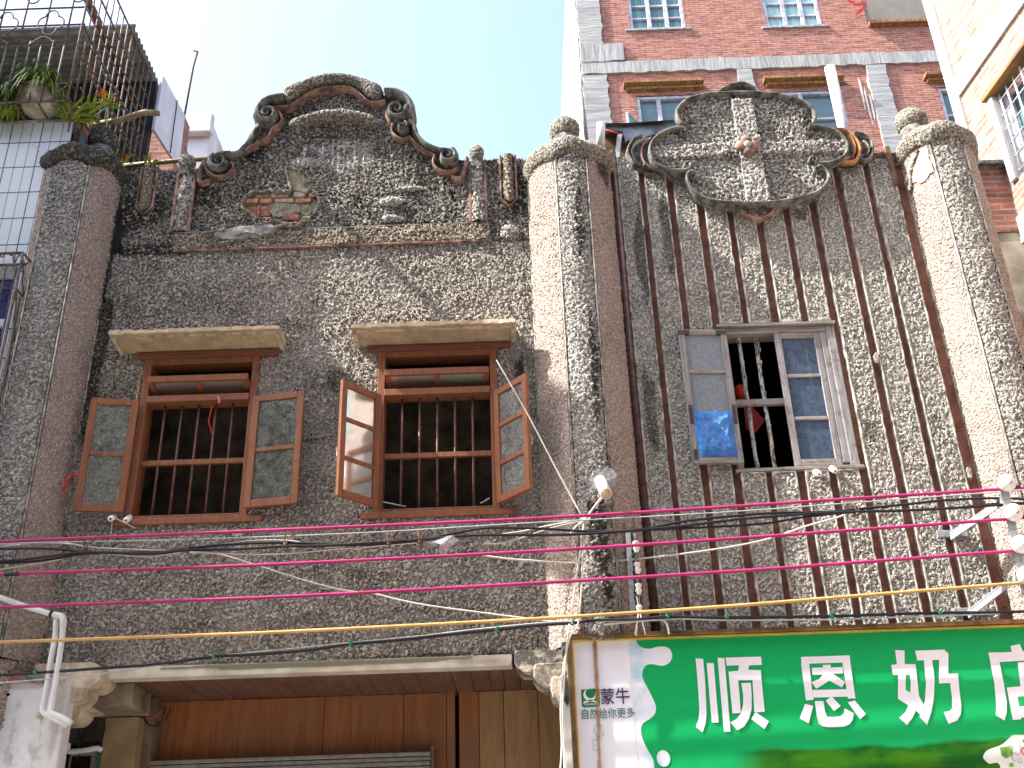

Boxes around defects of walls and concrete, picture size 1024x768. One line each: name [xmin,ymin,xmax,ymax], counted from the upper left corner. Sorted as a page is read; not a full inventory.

spalling [203,164,321,248]